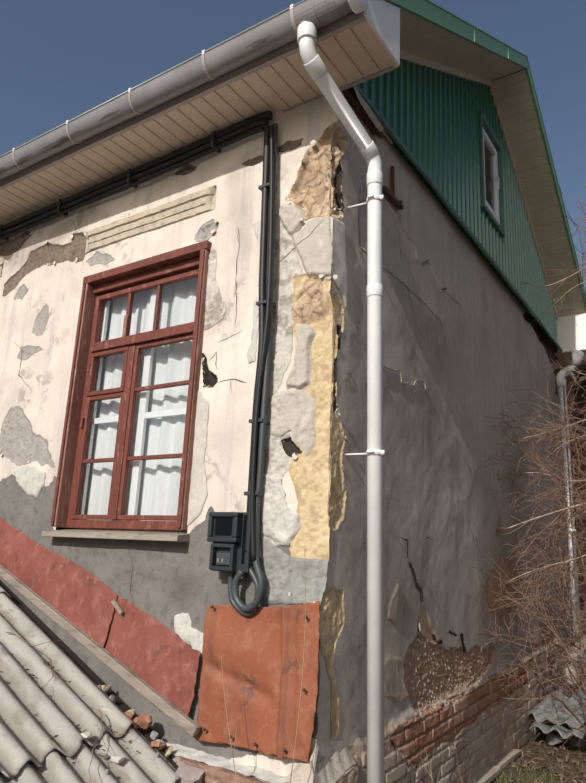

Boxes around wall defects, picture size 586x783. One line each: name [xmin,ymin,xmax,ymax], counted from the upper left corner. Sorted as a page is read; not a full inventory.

peeling [285,122,354,221]
peeling [252,220,261,247]
peeling [13,284,28,299]
peeling [32,304,49,336]
peeling [291,274,338,325]
peeling [17,345,42,360]
peeling [0,406,54,468]
flaking render [187,353,218,526]
flaking render [281,437,302,460]
flaking render [404,603,495,719]